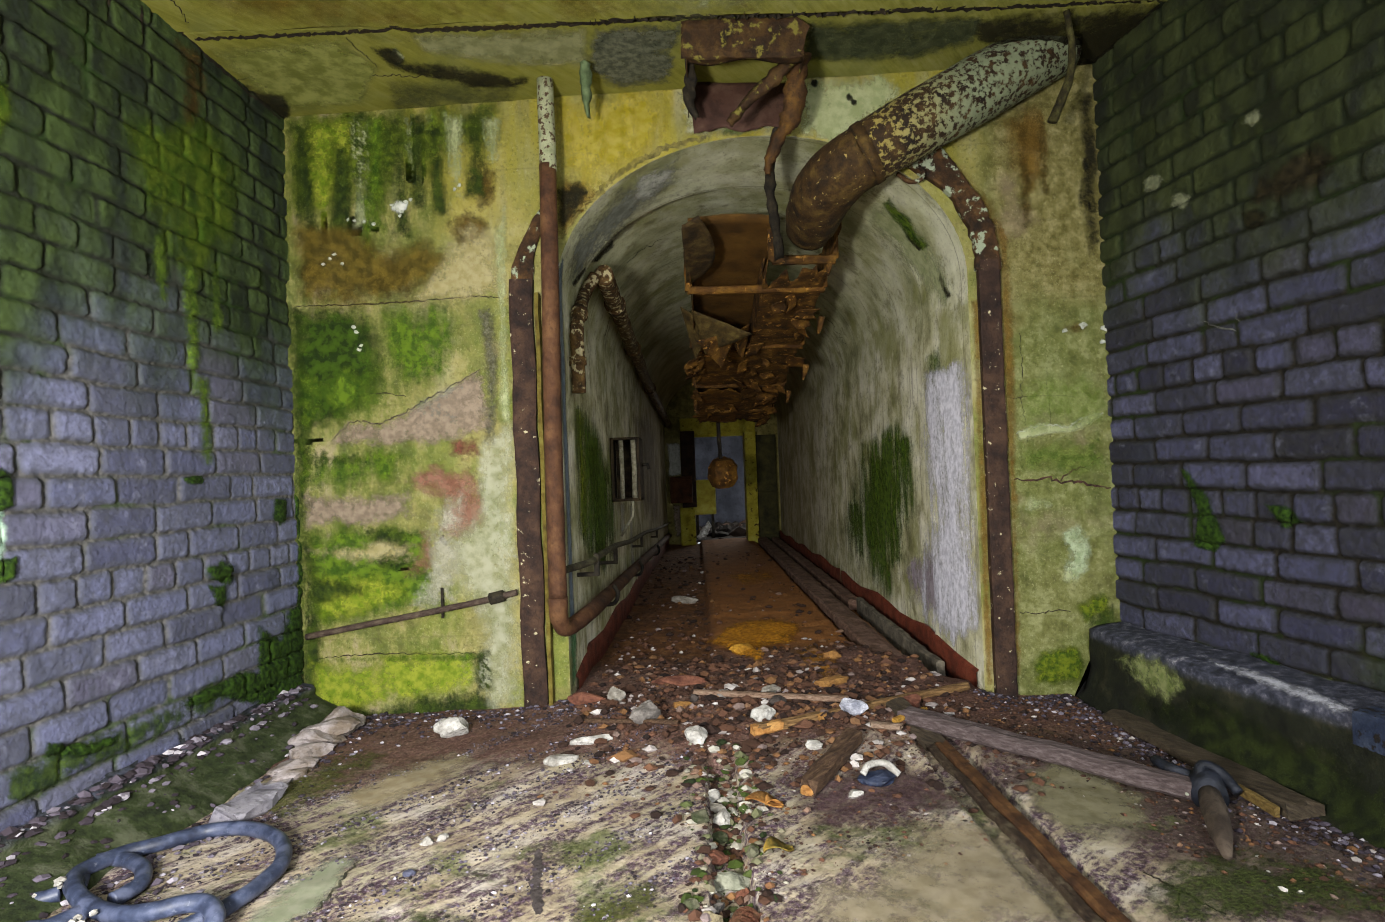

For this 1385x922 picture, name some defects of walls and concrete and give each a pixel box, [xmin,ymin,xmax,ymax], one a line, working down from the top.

crack [107,0,1159,119]
corrosion [1012,112,1048,218]
damp [290,104,513,704]
corrosion [786,363,809,403]
damp [848,438,909,563]
corrosion [980,452,991,678]